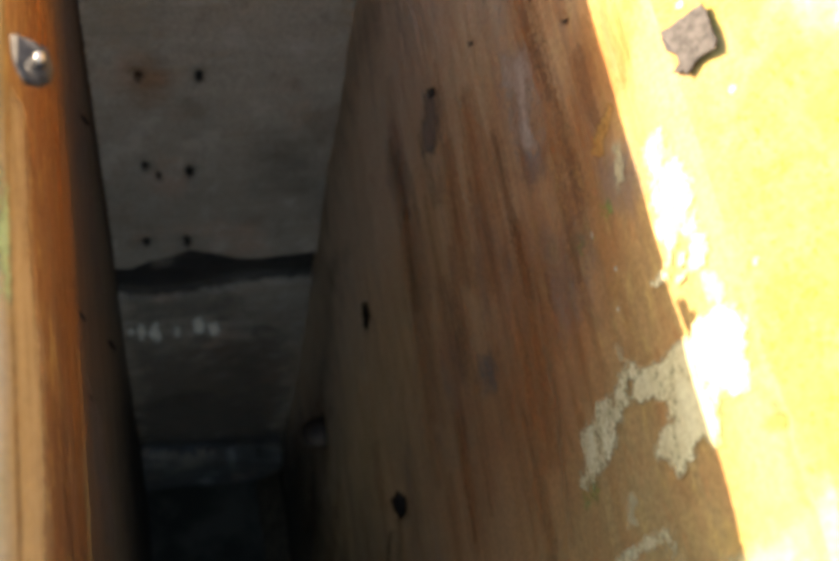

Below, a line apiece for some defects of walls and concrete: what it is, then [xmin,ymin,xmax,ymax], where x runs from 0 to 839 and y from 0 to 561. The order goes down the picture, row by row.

flaking render [580,128,751,490]